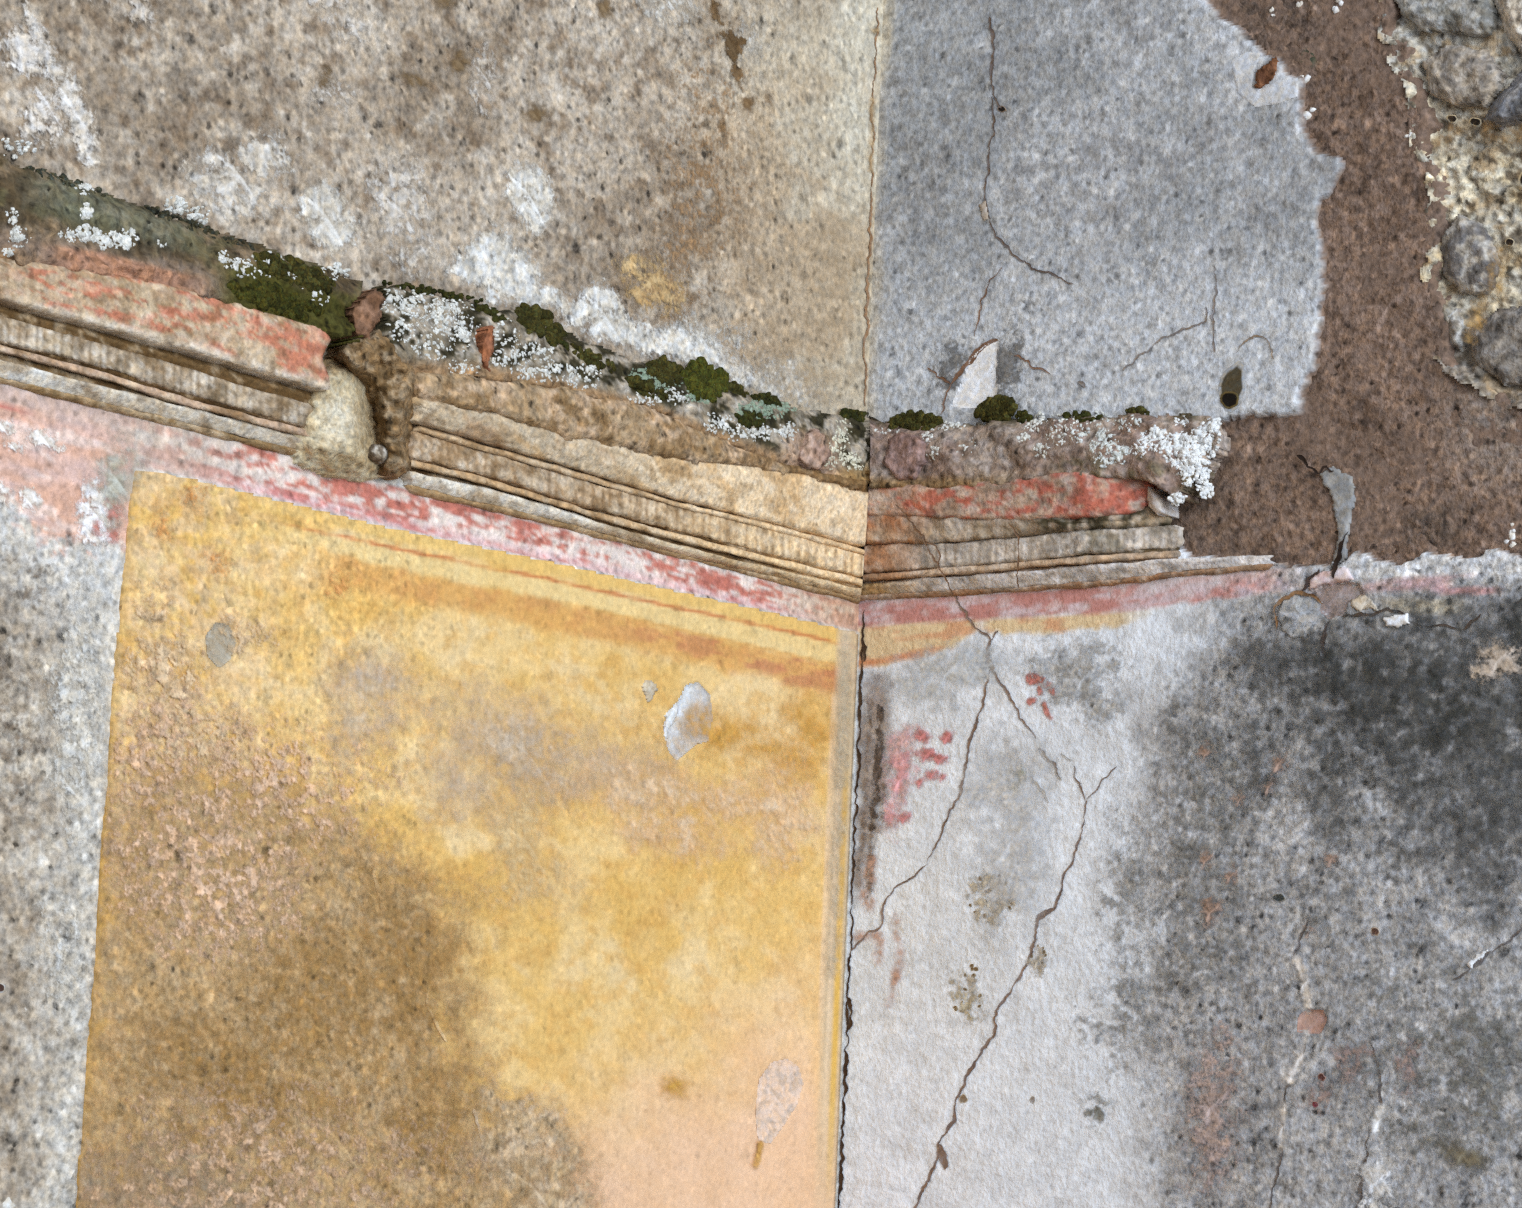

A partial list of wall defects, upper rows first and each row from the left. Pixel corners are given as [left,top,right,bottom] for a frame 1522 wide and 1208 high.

damp [0,2,100,166]
crack [927,17,1073,414]
spalling [1168,0,1522,639]
damp [0,558,600,1208]
peeling [641,680,658,702]
spalling [662,682,713,760]
crack [838,504,1117,1208]
crack [1269,1035,1308,1208]
damp [1074,590,1522,1129]
crack [1293,920,1308,981]
crack [1355,1040,1383,1208]
damp [1335,938,1522,1208]